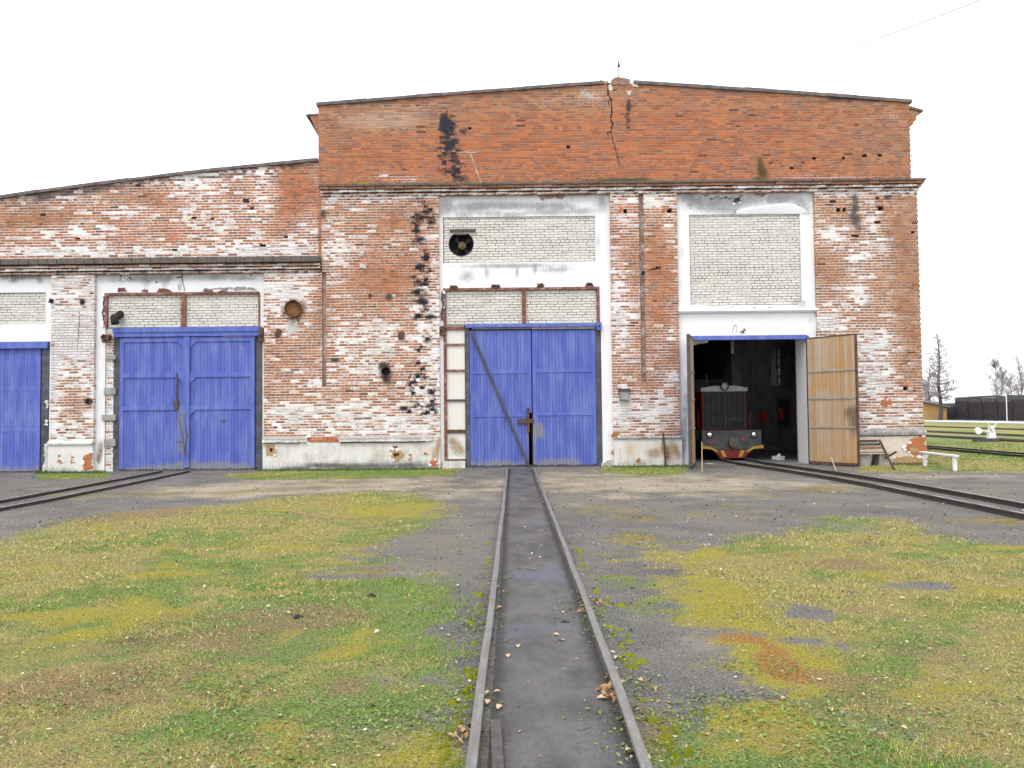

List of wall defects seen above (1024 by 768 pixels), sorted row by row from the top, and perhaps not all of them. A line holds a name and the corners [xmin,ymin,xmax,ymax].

damp [437,115,465,182]
crack [607,83,620,168]
spalling [892,435,928,464]